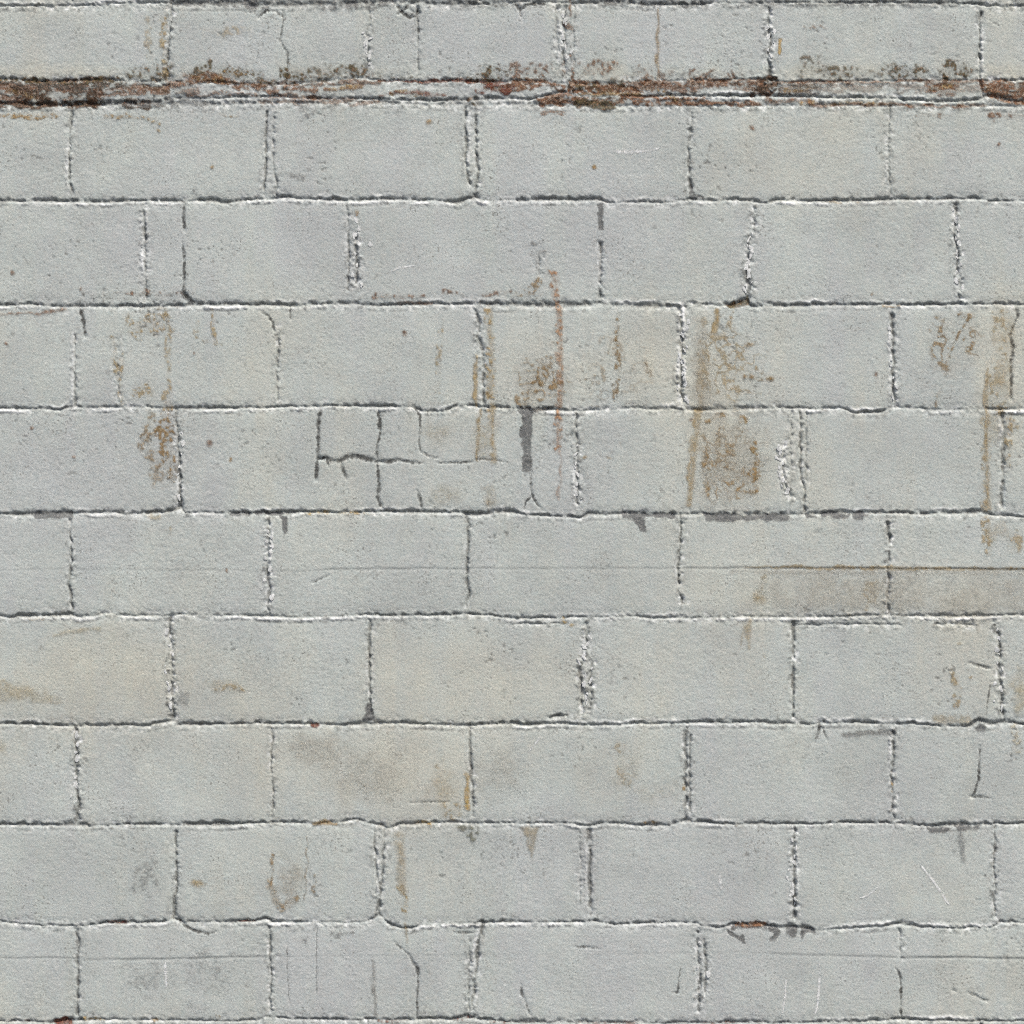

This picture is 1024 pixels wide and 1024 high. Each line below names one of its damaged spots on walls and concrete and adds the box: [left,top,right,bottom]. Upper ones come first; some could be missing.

corrosion [0,76,160,131]
corrosion [160,17,1008,115]
corrosion [140,348,176,478]
crack [315,412,420,506]
corrosion [473,309,494,422]
corrosion [515,270,564,450]
corrosion [687,410,760,500]
corrosion [933,314,974,369]